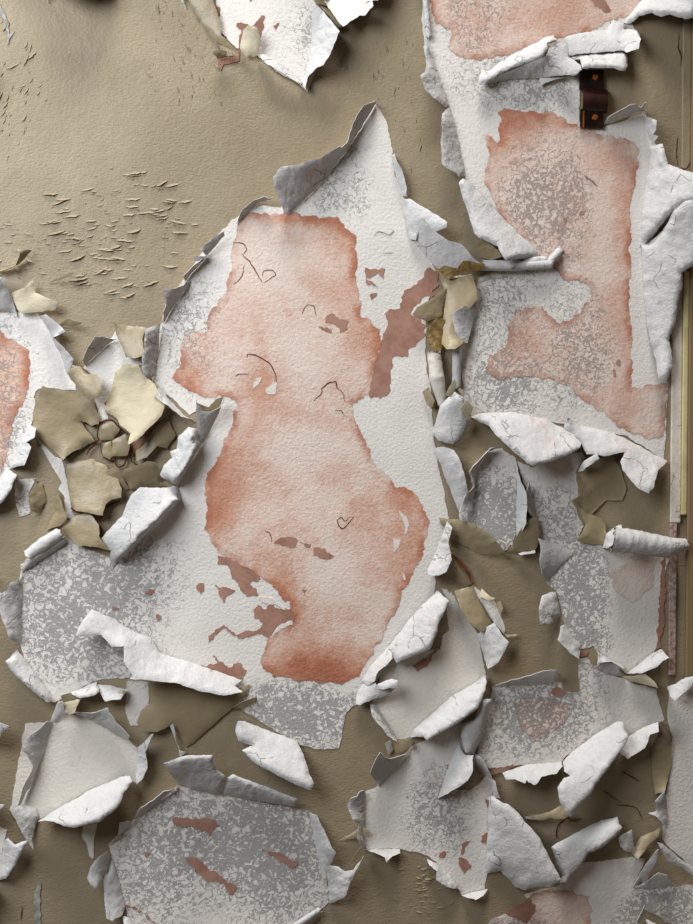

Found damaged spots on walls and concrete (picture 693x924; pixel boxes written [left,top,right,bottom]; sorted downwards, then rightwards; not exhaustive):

water stain [0,330,30,473]
water stain [172,212,430,685]
water stain [429,0,641,61]
peeling [420,0,693,493]
water stain [484,108,669,439]
peeling [87,451,693,924]